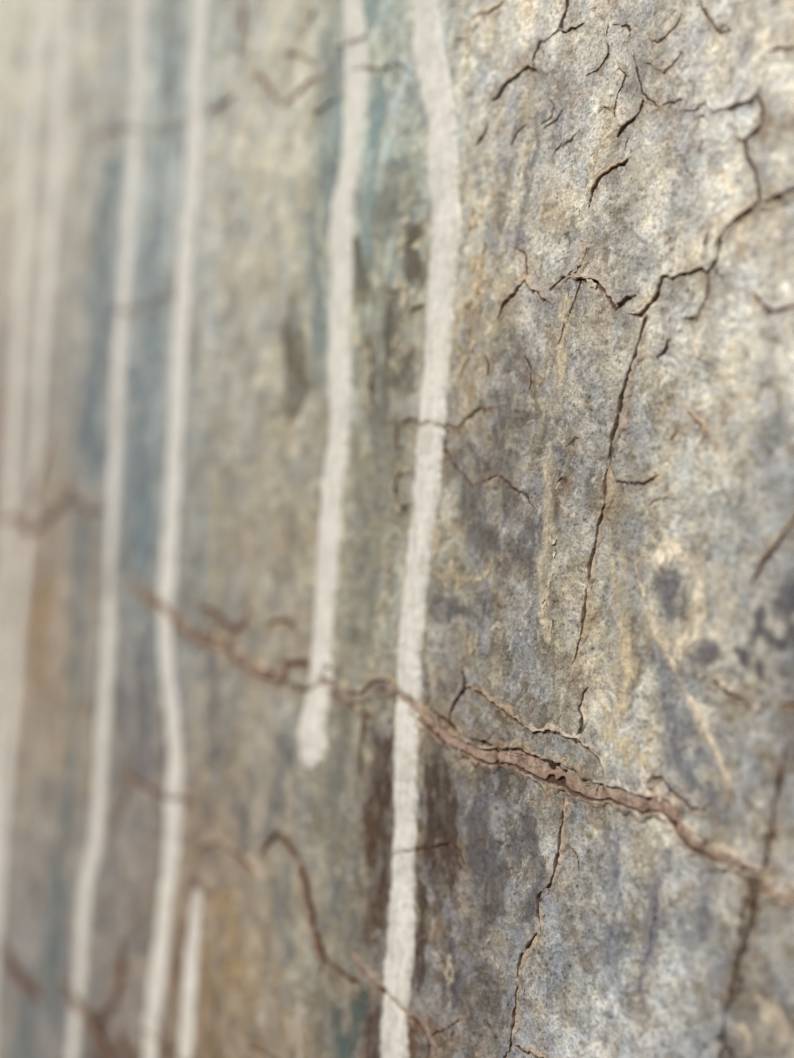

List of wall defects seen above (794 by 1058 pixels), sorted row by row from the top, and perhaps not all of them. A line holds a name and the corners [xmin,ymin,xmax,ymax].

crack [206,0,404,116]
crack [458,0,504,40]
crack [475,0,584,146]
crack [649,13,682,44]
crack [699,1,731,34]
damp [282,27,342,416]
damp [352,81,386,306]
damp [405,223,423,290]
damp [384,303,392,362]
crack [365,333,570,514]
crack [497,24,794,683]
crack [128,549,794,1058]